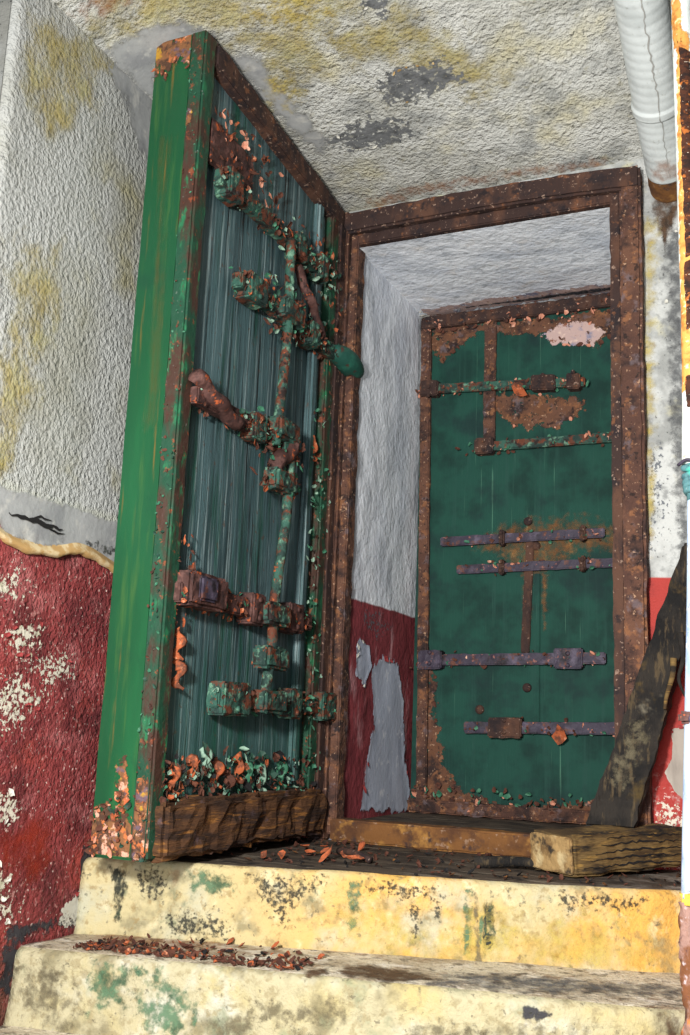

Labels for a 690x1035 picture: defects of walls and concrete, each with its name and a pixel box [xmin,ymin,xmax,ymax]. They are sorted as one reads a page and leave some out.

rust [496,391,586,432]
peeling [0,562,78,737]
peeling [355,605,594,816]
peeling [518,716,615,745]
peeling [655,725,684,827]
peeling [0,788,21,827]
peeling [0,853,24,929]
peeling [58,891,80,928]
damp [108,866,167,920]
damp [160,911,228,941]
damp [247,872,325,926]